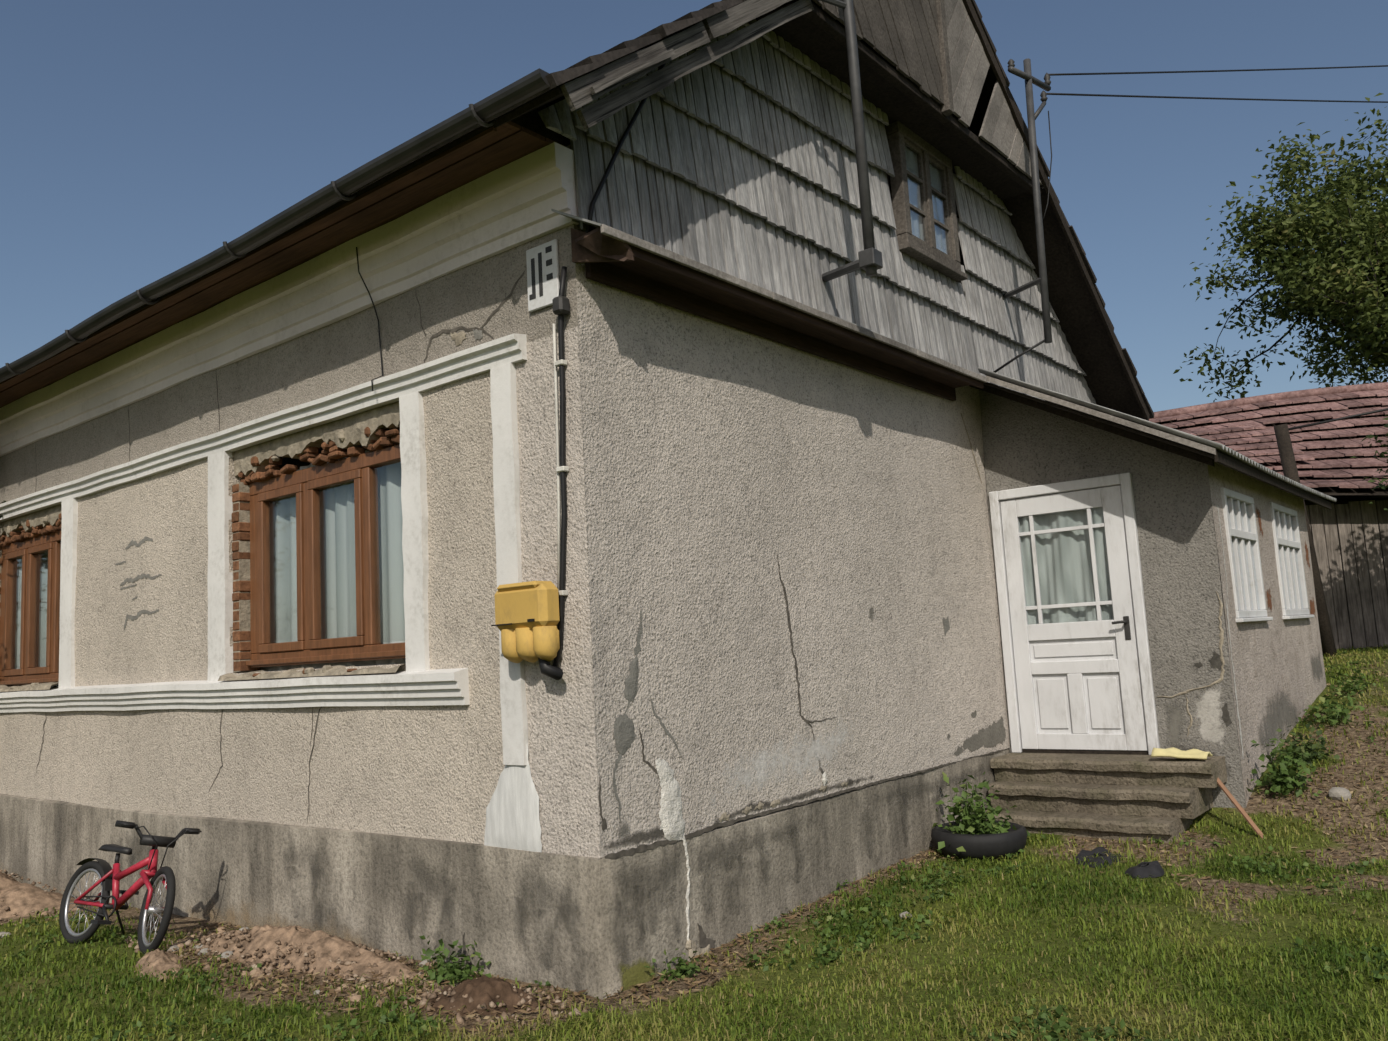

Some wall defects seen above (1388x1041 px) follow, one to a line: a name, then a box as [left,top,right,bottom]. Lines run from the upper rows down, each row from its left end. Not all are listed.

crack [479,270,525,330]
crack [598,554,1004,859]
peeling [1158,591,1232,746]
damp [610,825,664,847]
damp [716,776,873,822]
damp [683,840,691,941]